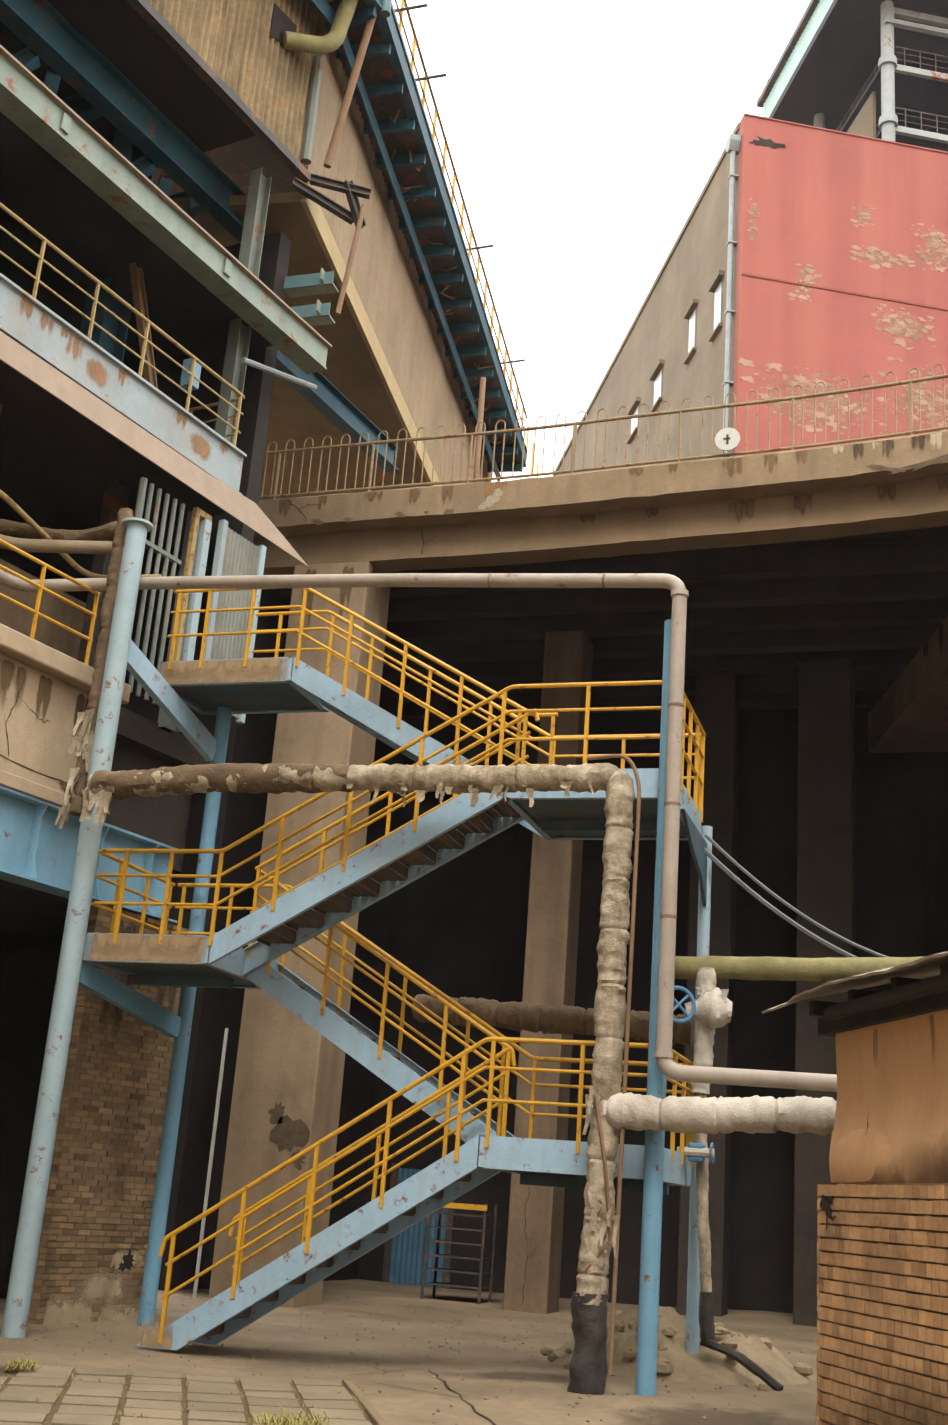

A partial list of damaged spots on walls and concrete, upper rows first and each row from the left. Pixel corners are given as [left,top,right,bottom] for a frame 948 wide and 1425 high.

peeling [787,263,822,302]
peeling [849,223,948,272]
corrosion [21,299,126,386]
peeling [737,303,948,434]
corrosion [177,412,227,458]
crack [0,663,68,783]